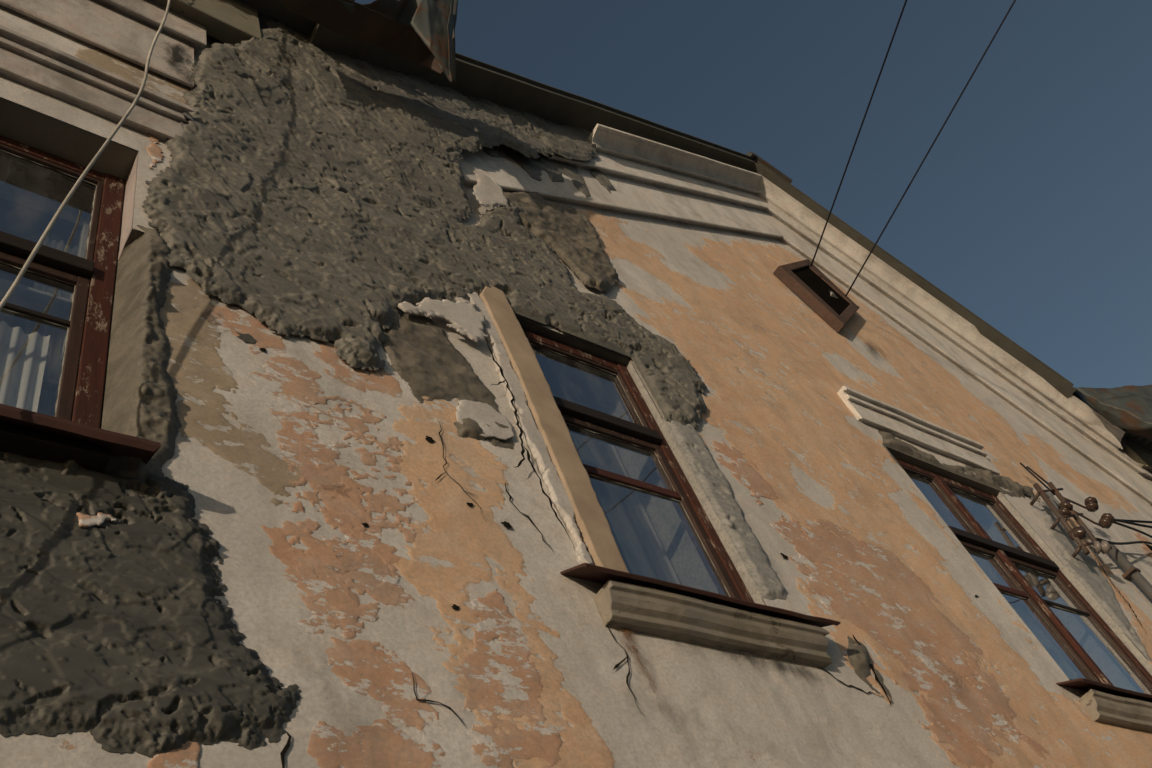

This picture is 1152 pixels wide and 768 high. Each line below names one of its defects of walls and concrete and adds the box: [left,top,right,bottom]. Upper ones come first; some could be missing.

peeling [76,512,117,528]
peeling [100,225,615,768]
crack [435,422,483,516]
crack [485,338,577,552]
peeling [473,173,1152,768]
crack [607,626,644,716]
crack [280,729,291,768]